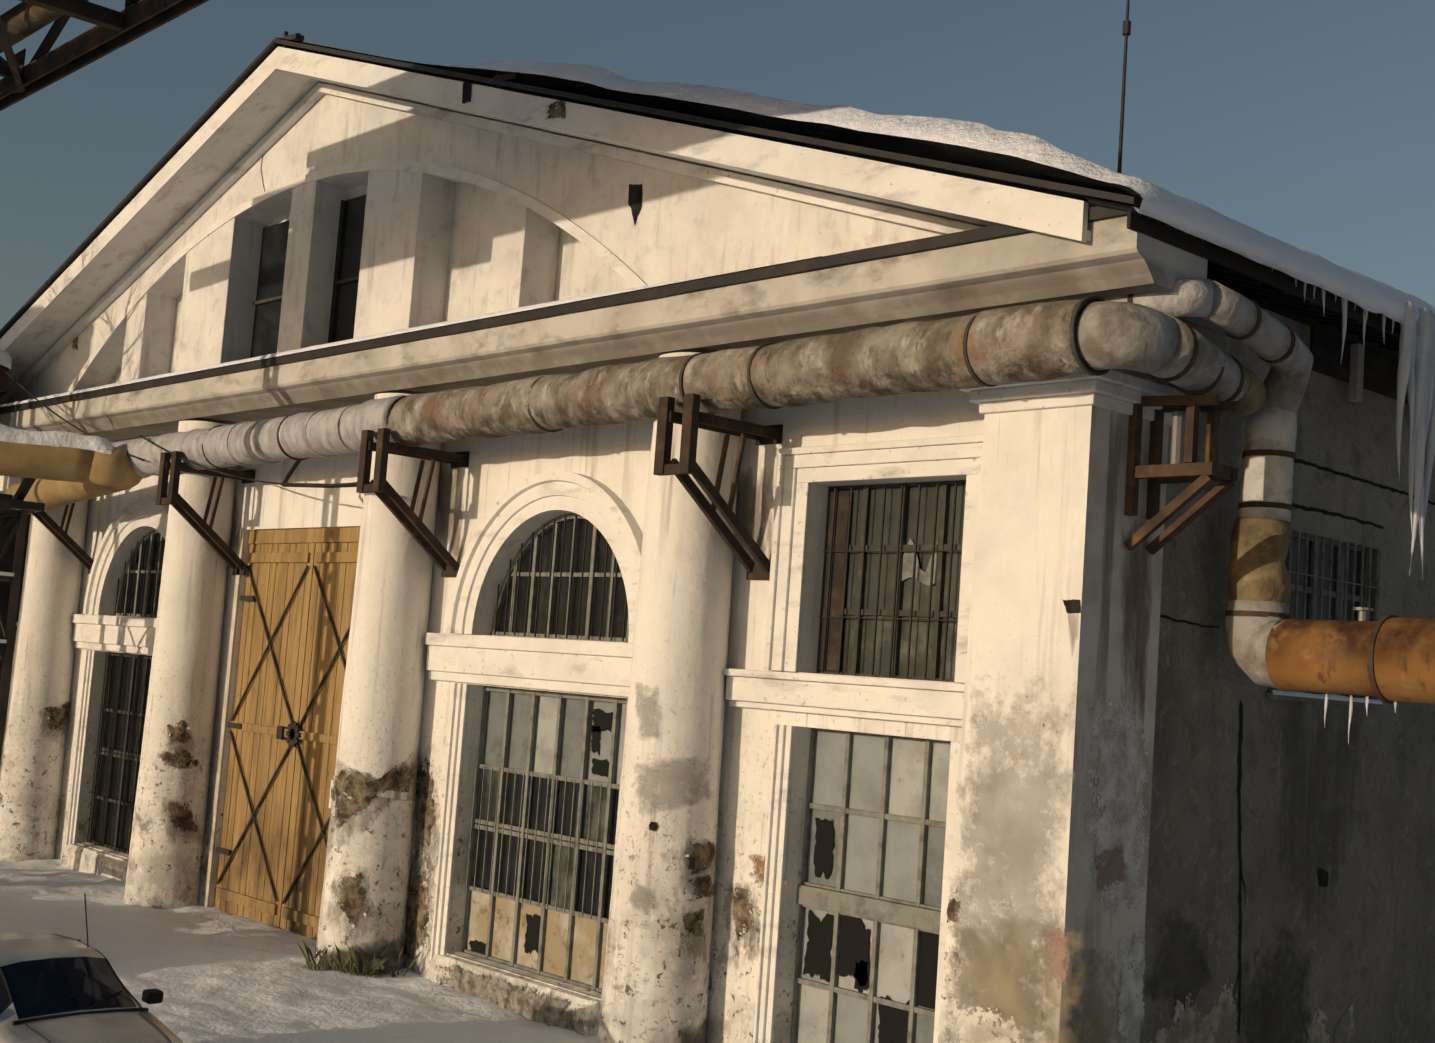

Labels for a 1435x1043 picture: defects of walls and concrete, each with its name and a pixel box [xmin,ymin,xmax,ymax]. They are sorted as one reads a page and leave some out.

spalling [44,700,71,735]
spalling [156,720,199,770]
spalling [166,800,197,832]
spalling [330,757,436,964]
spalling [630,886,653,909]
spalling [682,839,765,941]
peeling [941,708,1071,1043]
peeling [1084,694,1150,916]
crack [1234,701,1246,1036]
spalling [430,962,598,1035]
spalling [1117,922,1238,1043]
water stain [1149,920,1210,1013]